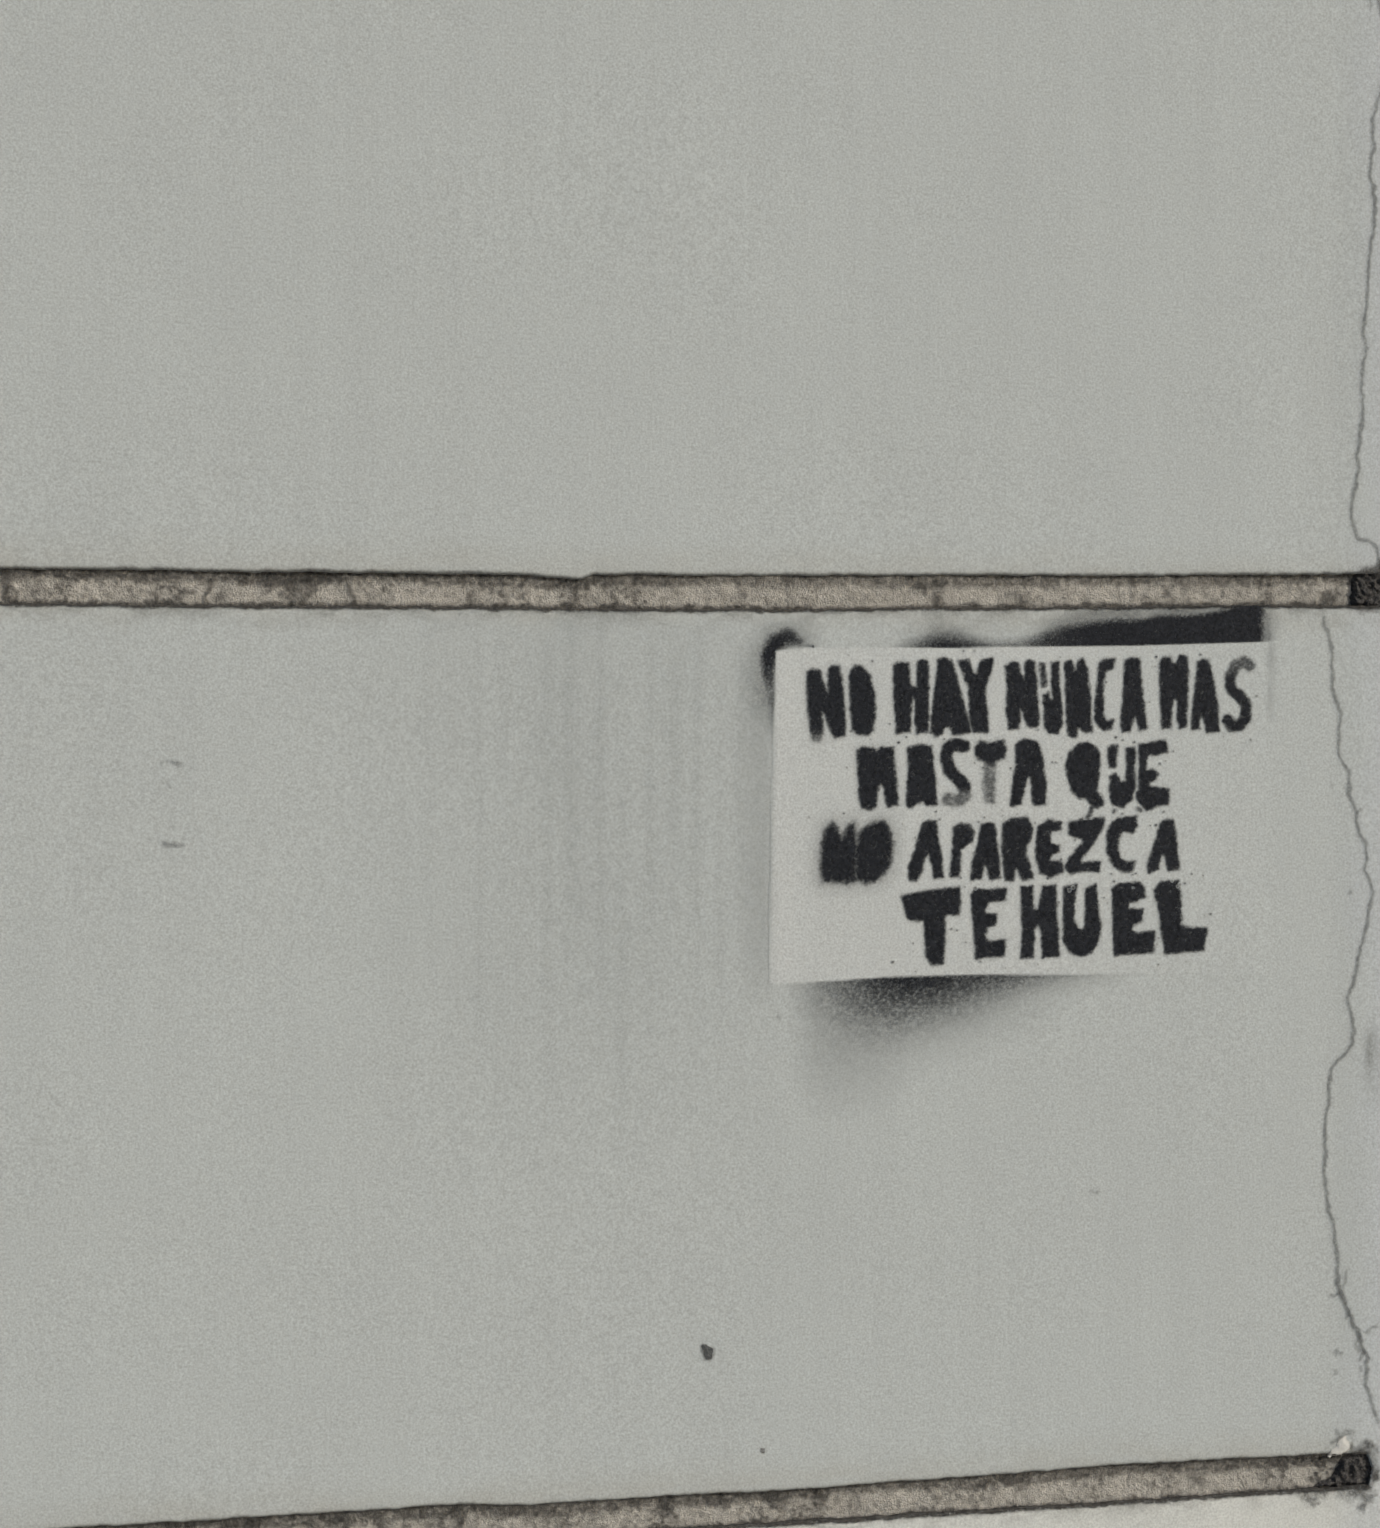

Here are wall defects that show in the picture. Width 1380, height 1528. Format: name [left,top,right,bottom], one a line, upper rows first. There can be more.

crack [1323,923,1376,1414]